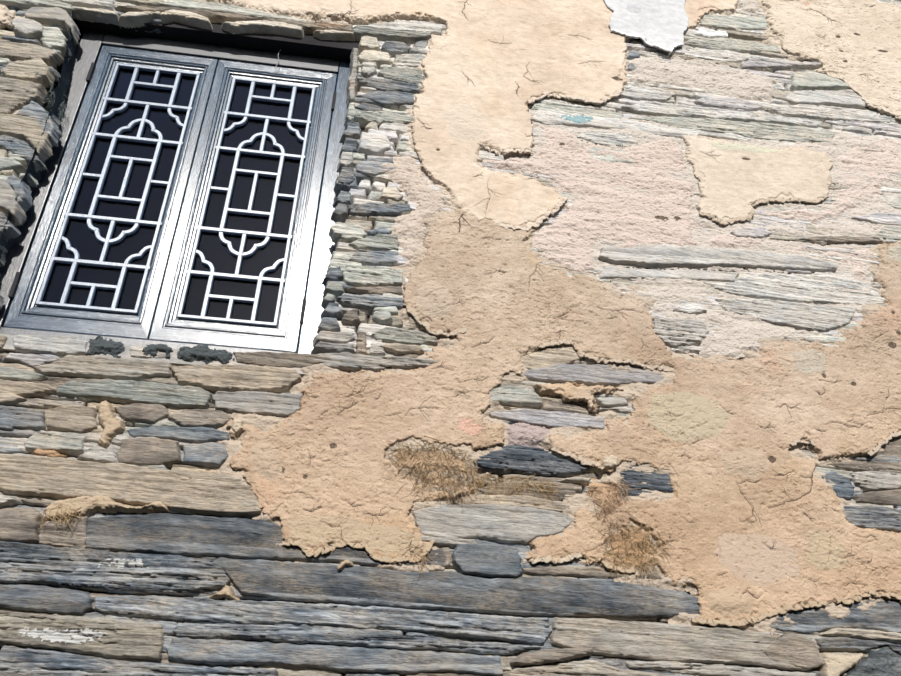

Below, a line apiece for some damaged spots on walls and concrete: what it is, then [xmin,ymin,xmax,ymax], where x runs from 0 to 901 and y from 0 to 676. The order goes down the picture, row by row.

spalling [704,0,769,17]
spalling [528,25,780,107]
spalling [762,26,901,124]
spalling [270,10,467,360]
crack [458,174,490,234]
spalling [252,115,901,632]
spalling [212,412,294,489]